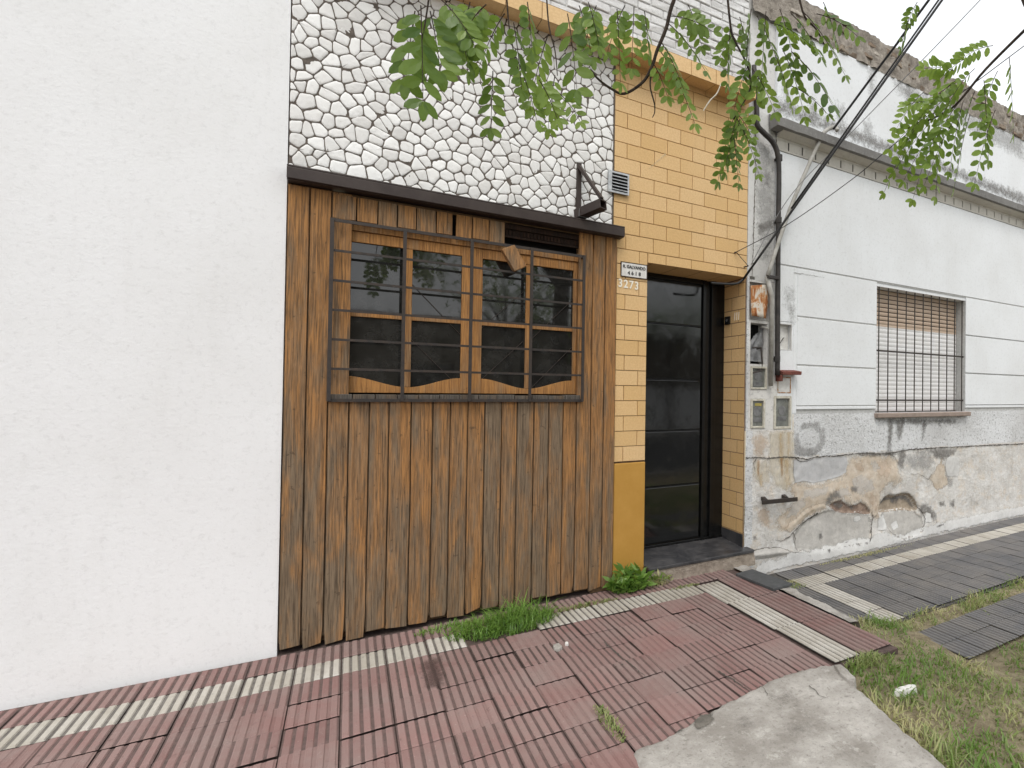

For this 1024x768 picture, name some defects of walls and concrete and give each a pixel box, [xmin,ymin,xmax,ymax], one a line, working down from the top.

water stain [795,423,824,454]
crack [746,443,1024,478]
water stain [864,418,954,467]
flaking render [756,455,1024,574]